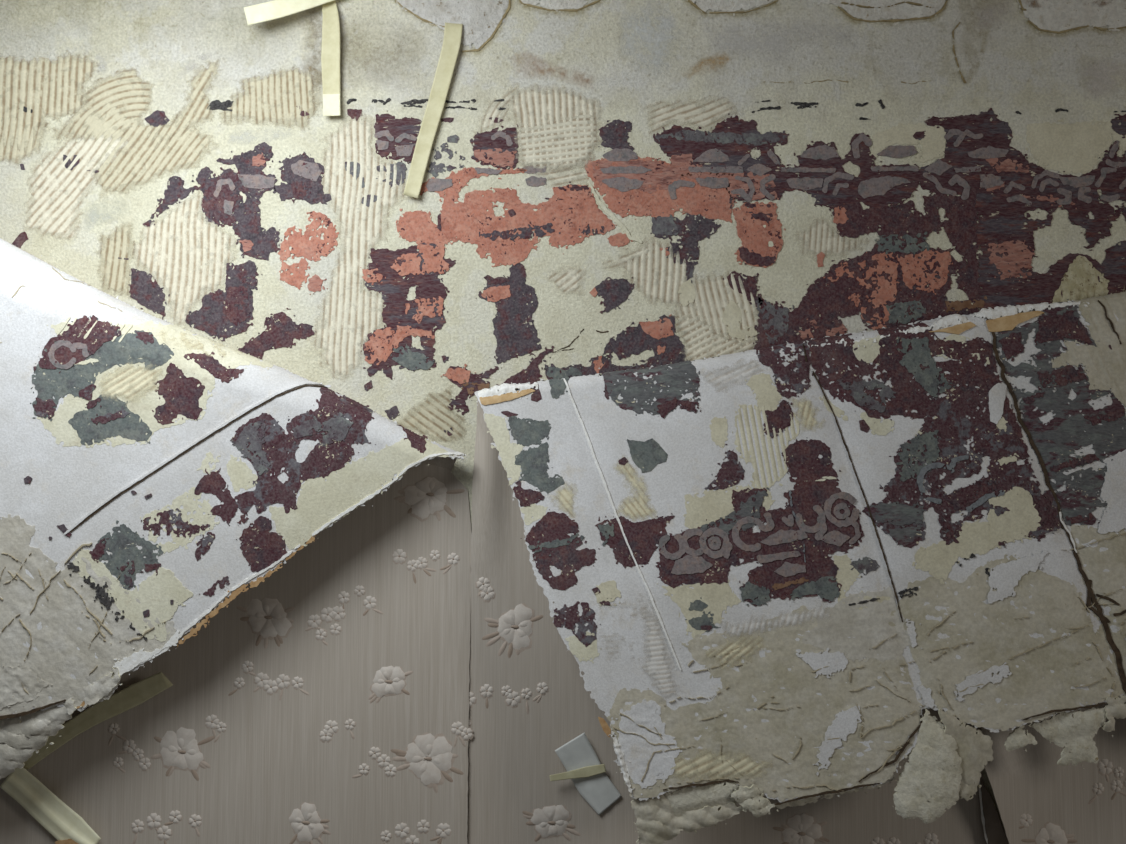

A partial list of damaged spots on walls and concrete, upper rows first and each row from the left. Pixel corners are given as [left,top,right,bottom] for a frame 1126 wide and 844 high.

peeling [143,142,339,359]
peeling [129,268,170,320]
peeling [33,315,154,373]
crack [554,329,609,352]
peeling [33,397,57,419]
peeling [78,384,129,425]
peeling [761,402,792,431]
peeling [938,474,1002,545]
peeling [89,538,108,562]
crack [0,385,327,720]
crack [563,378,742,791]
crack [774,318,1126,805]